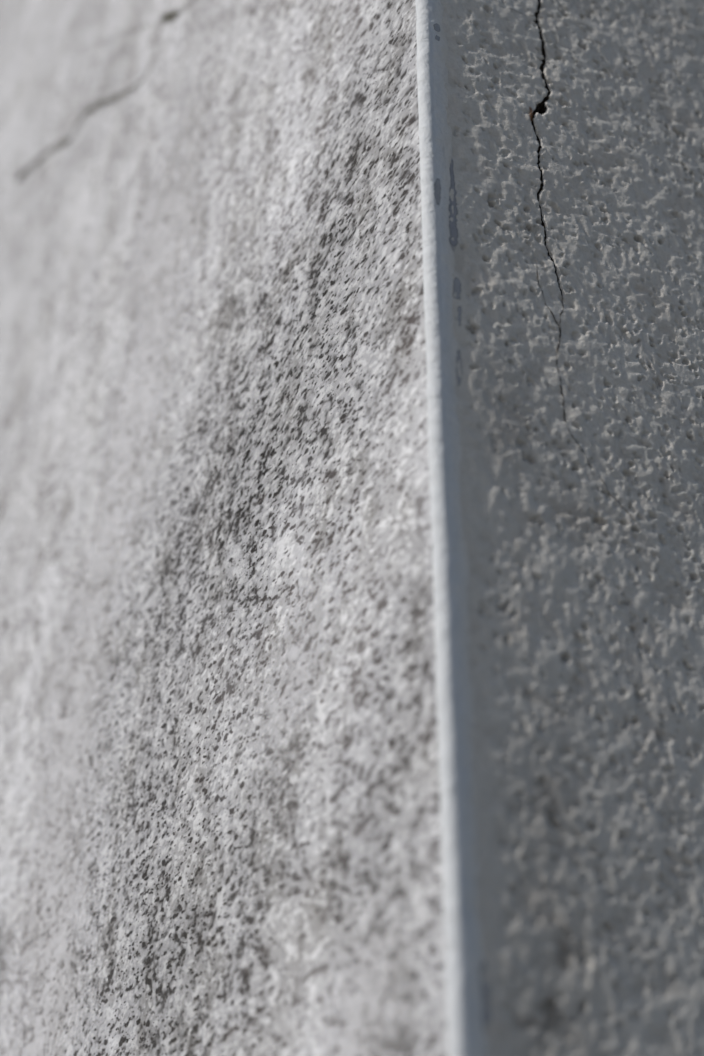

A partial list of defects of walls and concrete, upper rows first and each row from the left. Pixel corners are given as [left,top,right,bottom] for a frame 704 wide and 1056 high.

crack [160,0,192,22]
crack [15,57,153,182]
crack [503,0,640,525]